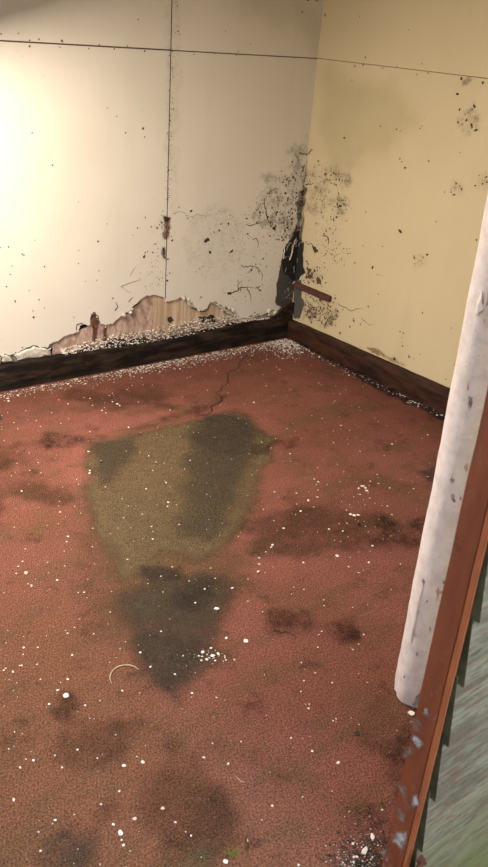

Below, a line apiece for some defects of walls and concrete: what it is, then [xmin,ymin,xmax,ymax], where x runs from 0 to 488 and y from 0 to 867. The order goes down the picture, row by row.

peeling [0,295,277,365]
water stain [230,136,361,334]
water stain [85,414,274,689]